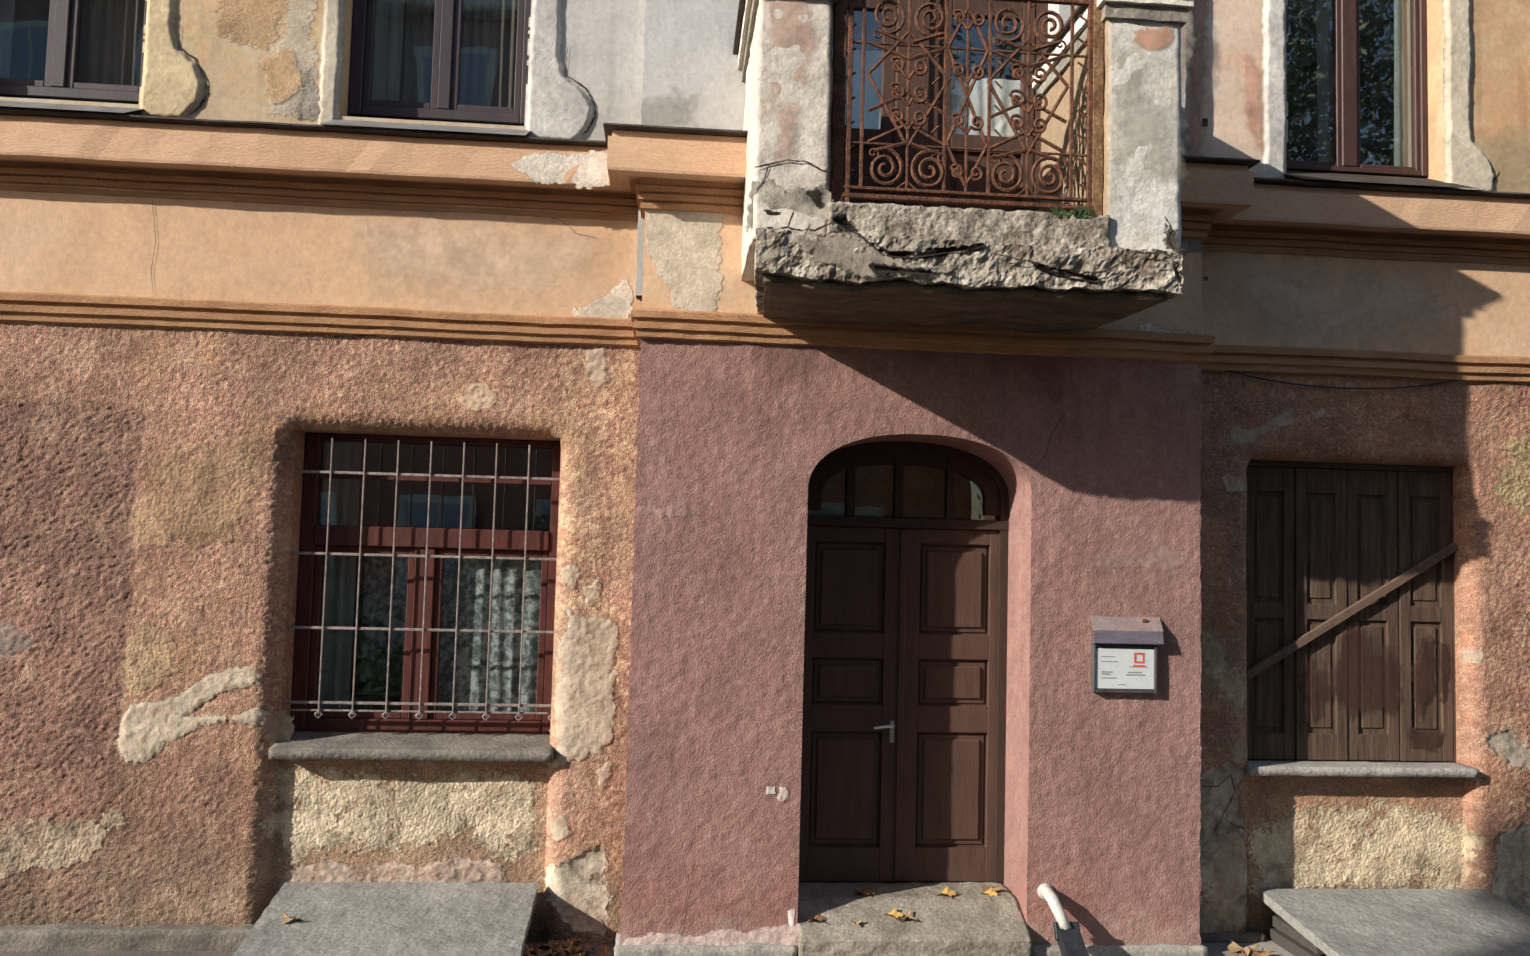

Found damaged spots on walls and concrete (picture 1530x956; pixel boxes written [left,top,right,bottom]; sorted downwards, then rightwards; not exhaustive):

peeling [213,0,321,122]
peeling [507,150,610,189]
crack [754,159,830,192]
crack [767,209,876,248]
crack [993,216,1194,281]
flaking render [116,565,619,937]
peeling [766,786,788,801]
flaking render [1199,625,1530,934]
peeling [622,908,801,951]